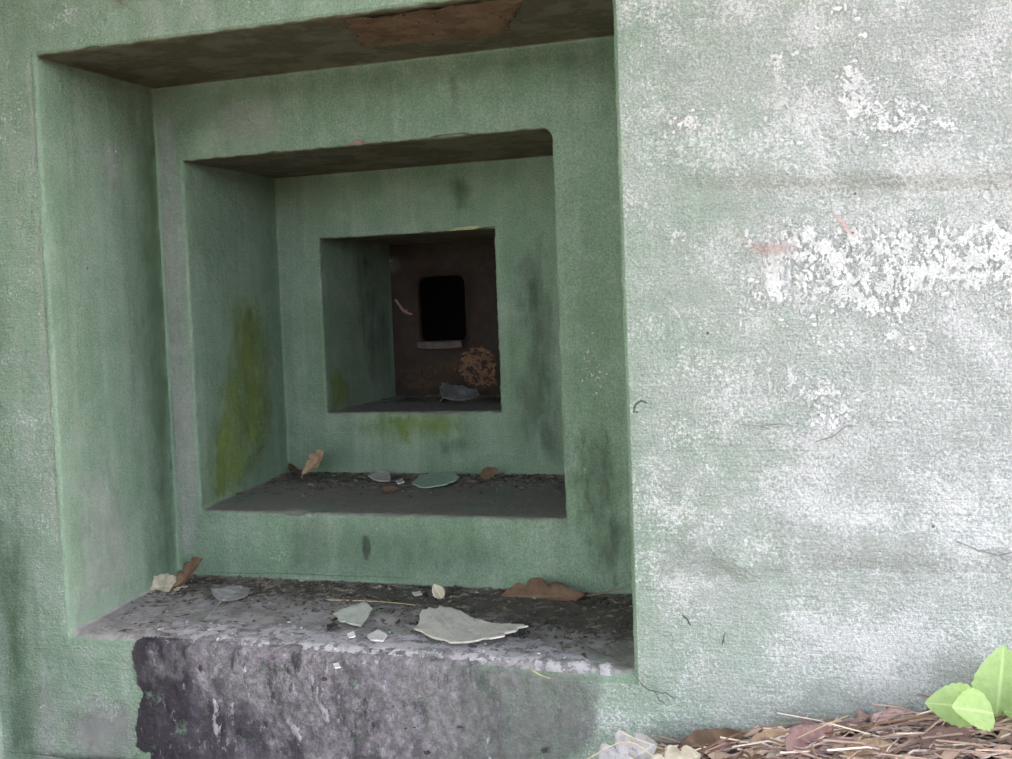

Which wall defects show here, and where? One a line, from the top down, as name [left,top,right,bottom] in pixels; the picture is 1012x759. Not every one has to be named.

peeling [738,185,1012,368]